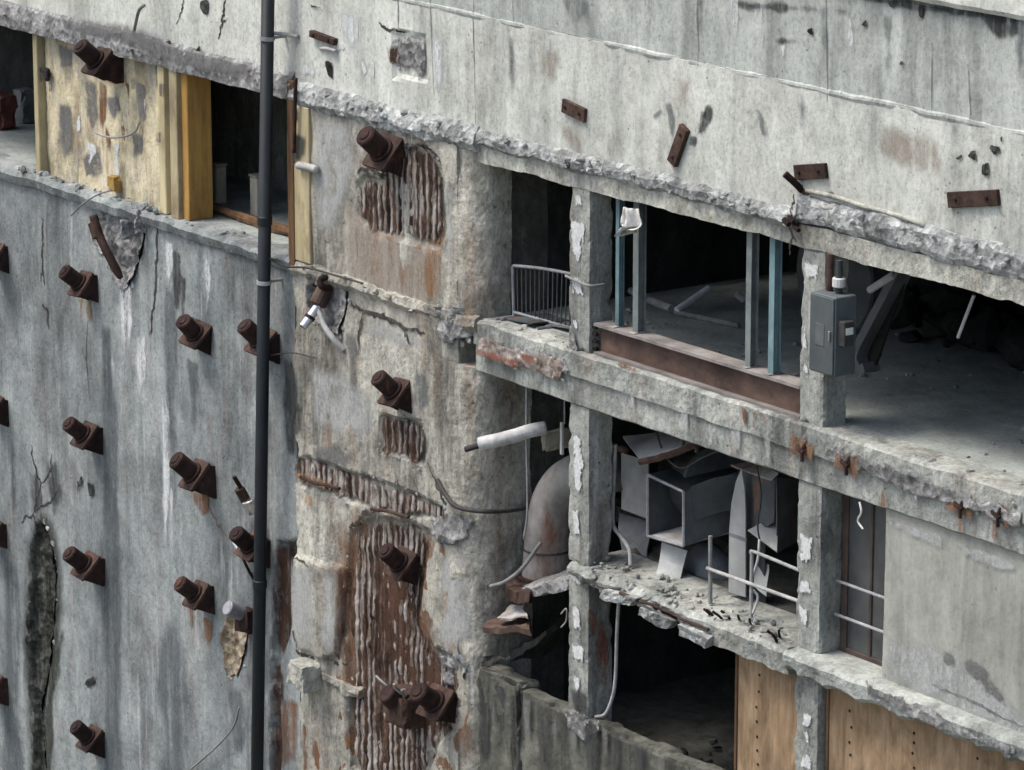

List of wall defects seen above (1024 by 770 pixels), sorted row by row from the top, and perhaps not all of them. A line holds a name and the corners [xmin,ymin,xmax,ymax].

spalling [354,148,447,252]
spalling [92,211,145,291]
corrosion [348,211,443,315]
peeling [570,220,585,261]
crack [348,303,425,354]
crack [21,445,52,527]
spalling [377,411,425,471]
peeling [573,435,584,492]
peeling [799,533,814,562]
spalling [294,458,478,770]
spalling [619,592,752,631]
spalling [219,616,247,680]